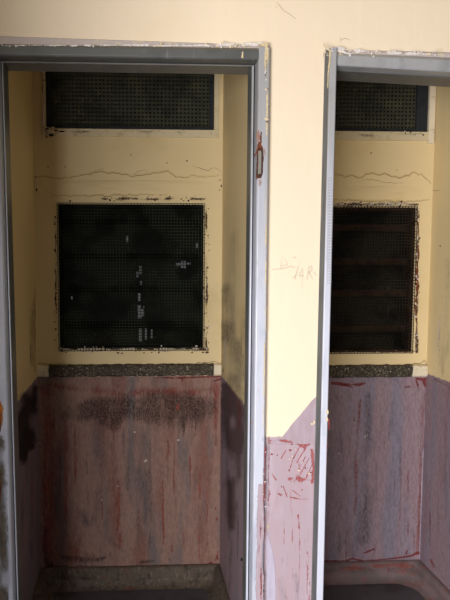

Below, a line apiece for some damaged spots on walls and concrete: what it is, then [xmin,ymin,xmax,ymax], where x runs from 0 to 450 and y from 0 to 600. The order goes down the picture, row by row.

peeling [323,43,449,88]
peeling [1,41,269,138]
crack [40,166,221,197]
crack [333,171,439,203]
damp [79,376,221,431]